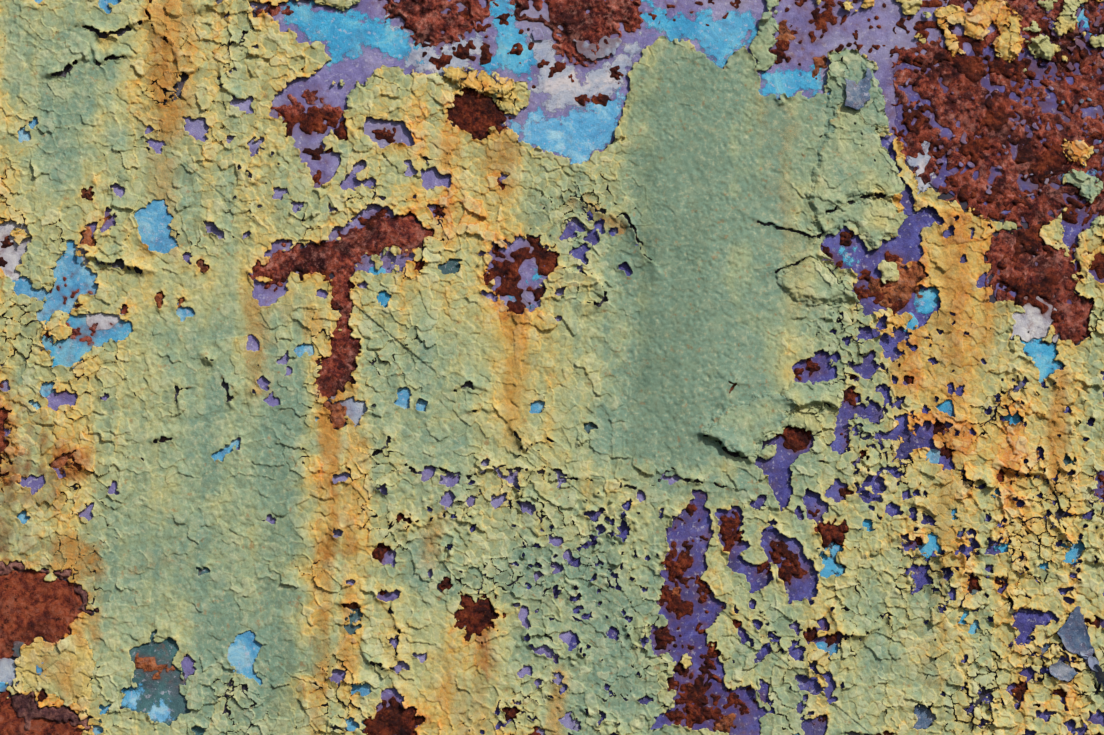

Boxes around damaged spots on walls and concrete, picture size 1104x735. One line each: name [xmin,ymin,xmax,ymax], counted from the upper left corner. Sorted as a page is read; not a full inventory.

corrosion [510,0,643,67]
peeling [182,116,209,142]
peeling [81,186,94,201]
peeling [0,199,209,411]
corrosion [478,228,583,314]
corrosion [880,0,1104,491]
corrosion [248,204,434,498]
peeling [246,0,1104,735]
peeling [17,450,82,495]
corrosion [0,537,99,659]
peeling [227,630,263,685]
corrosion [0,690,91,735]